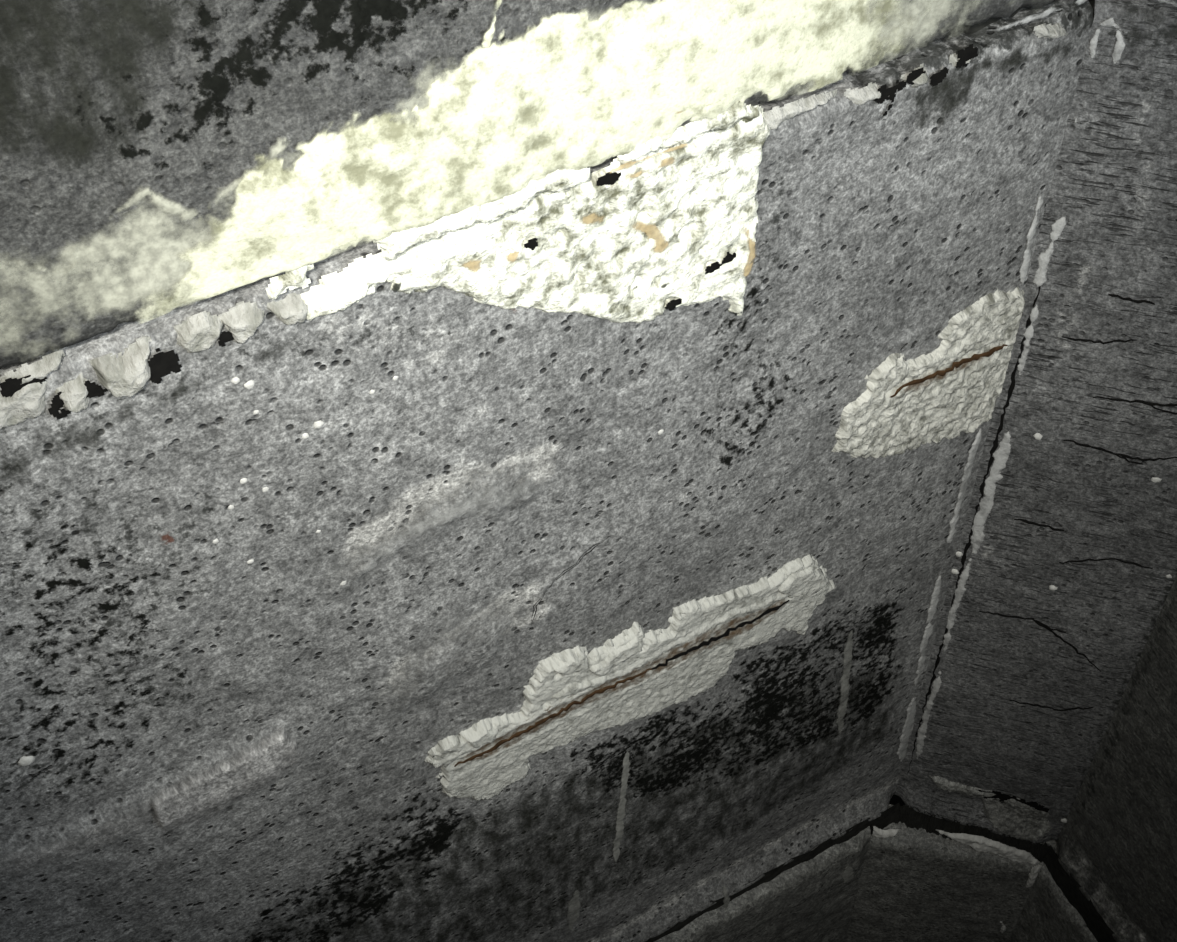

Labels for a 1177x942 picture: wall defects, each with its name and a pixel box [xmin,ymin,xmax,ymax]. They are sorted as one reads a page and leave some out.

leakage [917,50,1027,127]
leakage [0,0,980,486]
peeling [0,335,152,430]
peeling [174,293,308,353]
leakage [831,287,1025,459]
crack [1062,336,1137,344]
crack [1063,439,1177,465]
crack [1108,294,1155,305]
crack [1093,396,1177,415]
crack [907,286,1101,774]
leakage [0,536,169,785]
leakage [231,554,904,942]